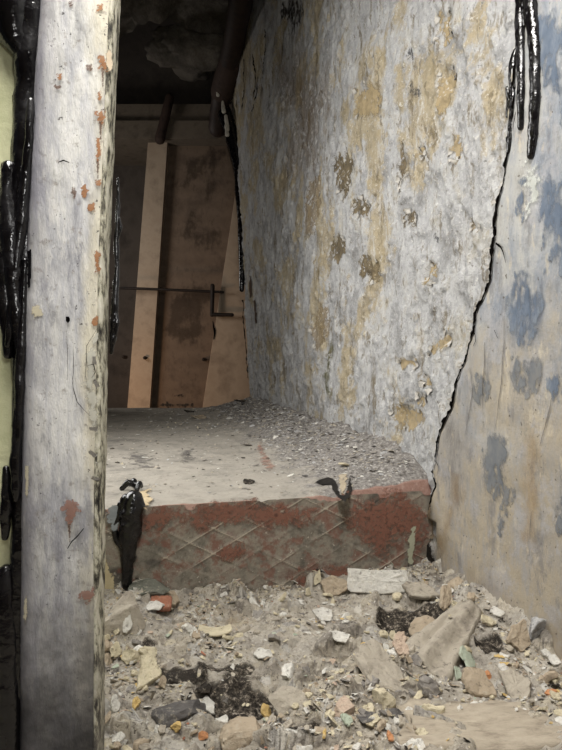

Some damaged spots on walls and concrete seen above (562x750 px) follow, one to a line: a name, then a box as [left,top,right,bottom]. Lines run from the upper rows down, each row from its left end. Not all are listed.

rust [86,55,108,100]
peeling [435,65,457,121]
rust [71,184,95,211]
rust [94,111,106,186]
peeling [334,149,371,220]
peeling [396,141,407,193]
peeling [402,208,417,227]
water stain [524,160,540,219]
peeling [330,232,346,264]
peeling [359,254,381,286]
crack [428,62,516,510]
peeling [387,355,433,432]